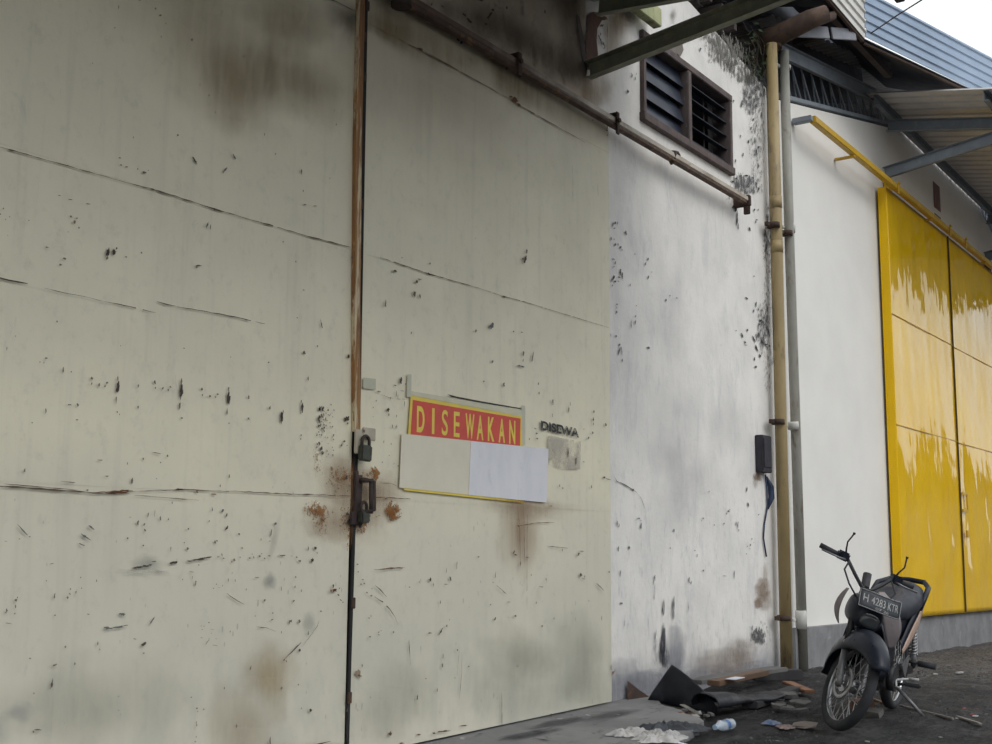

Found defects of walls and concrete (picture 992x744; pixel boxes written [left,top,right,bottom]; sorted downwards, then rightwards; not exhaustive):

leakage [701,31,768,205]
leakage [756,207,773,354]
rust [329,467,380,489]
rust [304,502,367,545]
rust [376,502,401,521]